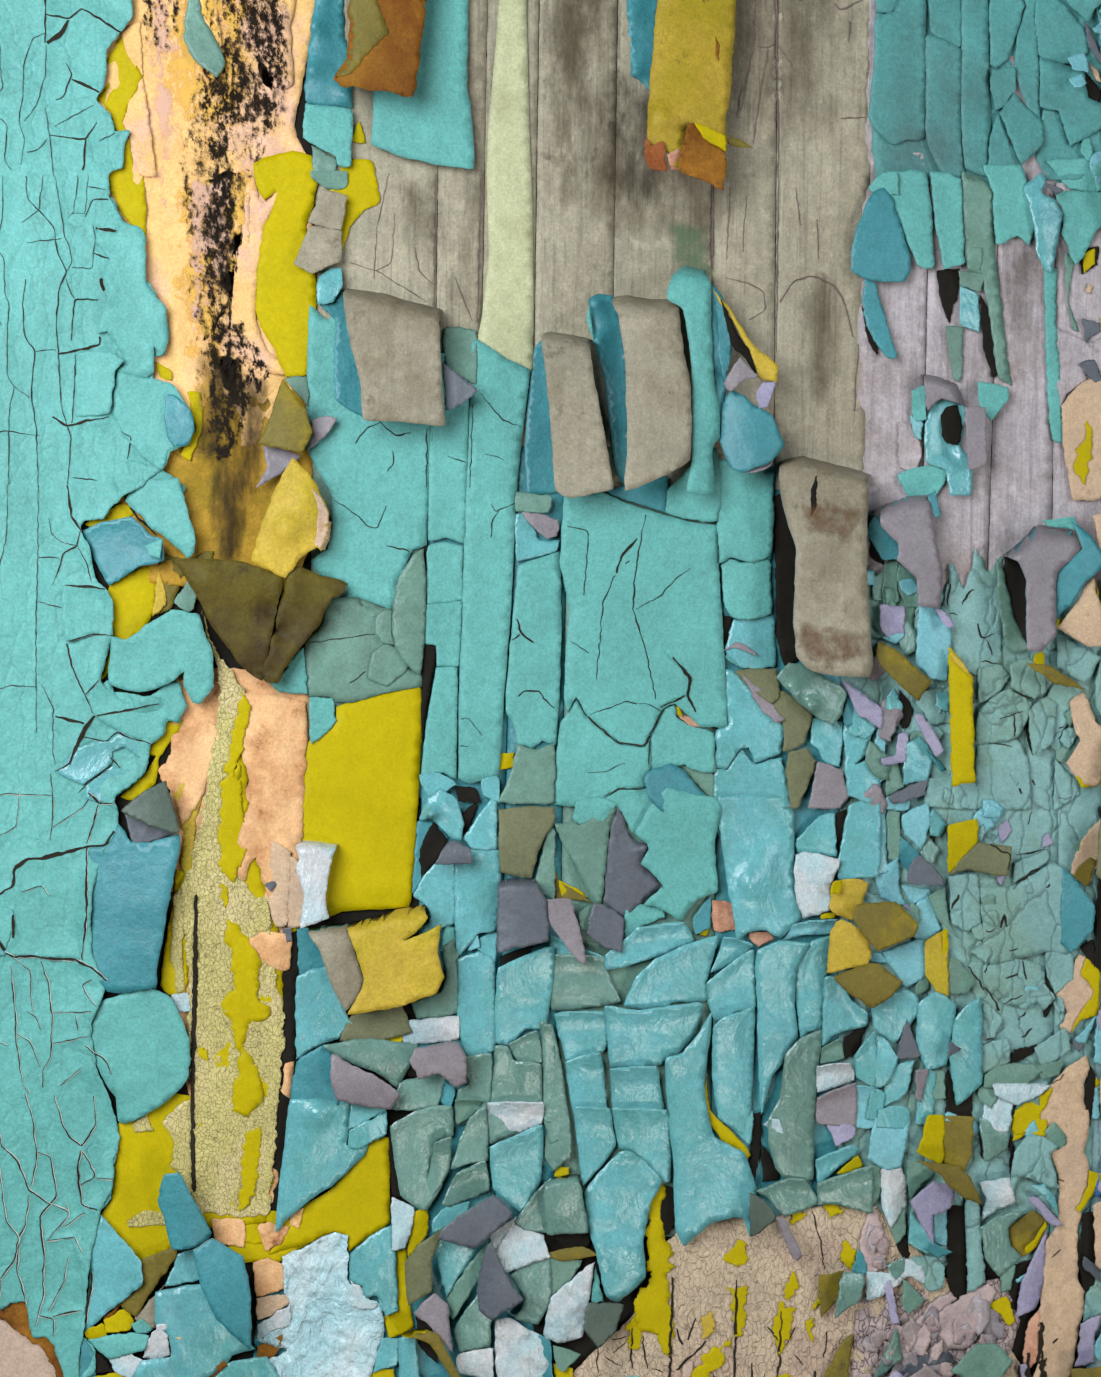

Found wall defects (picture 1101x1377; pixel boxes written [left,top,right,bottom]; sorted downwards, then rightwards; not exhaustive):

leakage [141,0,180,60]
peeling [626,0,753,190]
leakage [180,0,293,560]
peeling [851,0,1101,518]
crack [0,0,159,1336]
peeling [0,0,475,1377]
crack [334,500,409,552]
crack [356,393,521,536]
crack [509,619,534,643]
crack [518,515,696,796]
peeling [412,327,1101,1377]
peeling [373,1116,624,1377]